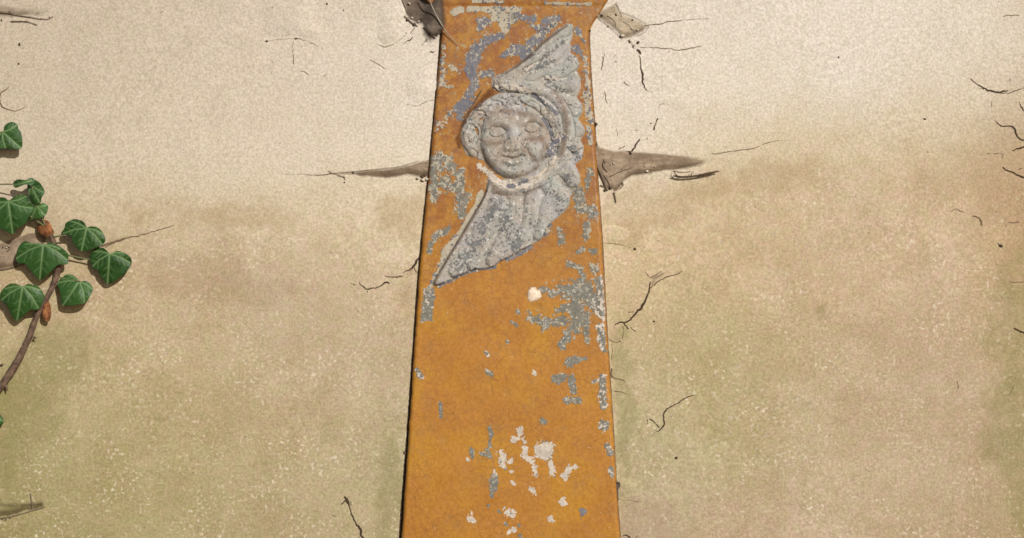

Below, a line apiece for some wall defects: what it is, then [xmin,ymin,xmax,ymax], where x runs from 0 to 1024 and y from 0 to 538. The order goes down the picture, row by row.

crack [589,18,708,152]
crack [971,79,1024,178]
peeling [418,0,607,405]
crack [351,32,441,538]
crack [598,176,682,538]
crack [647,395,693,432]
crack [333,496,364,538]
peeling [466,425,579,538]
peeling [547,497,587,523]